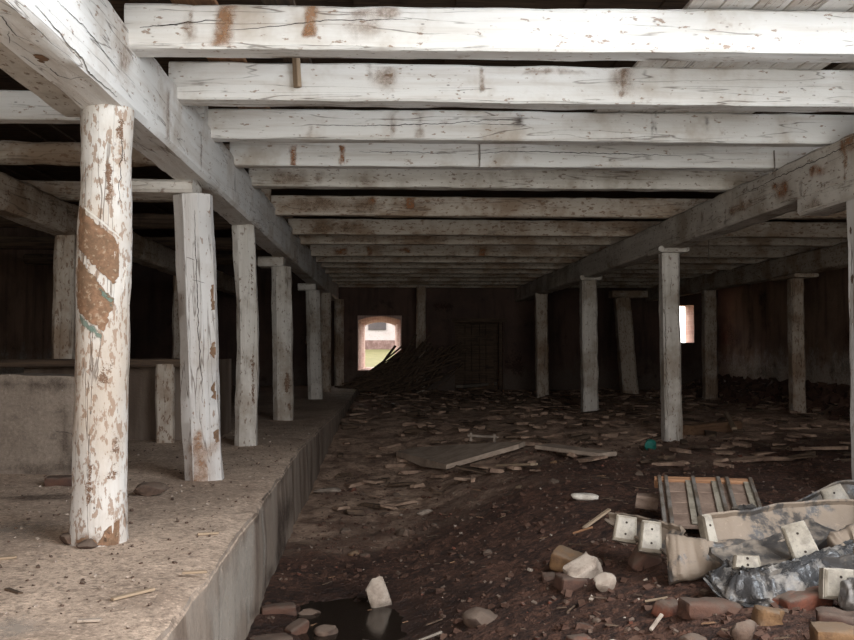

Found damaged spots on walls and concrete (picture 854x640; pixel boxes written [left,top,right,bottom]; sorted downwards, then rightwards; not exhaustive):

peeling [77,205,129,338]
peeling [85,464,93,506]
peeling [76,519,120,546]